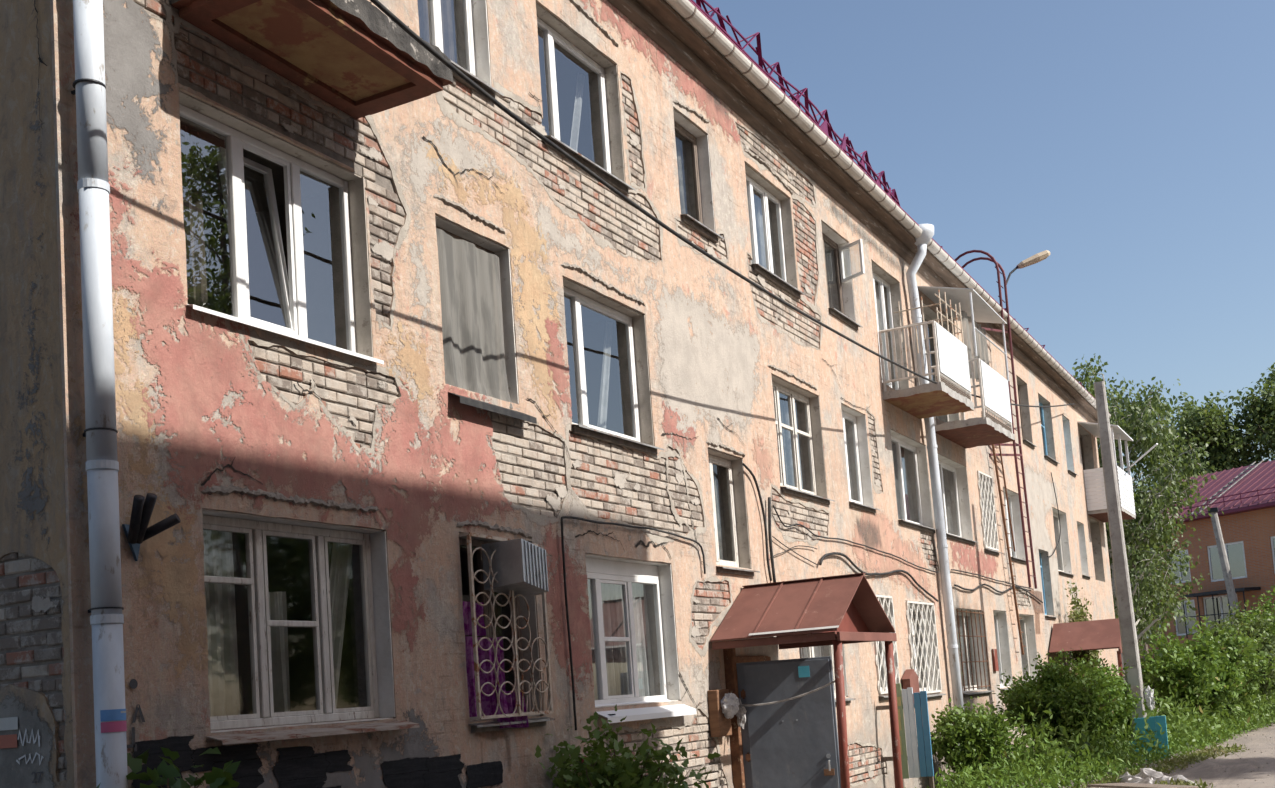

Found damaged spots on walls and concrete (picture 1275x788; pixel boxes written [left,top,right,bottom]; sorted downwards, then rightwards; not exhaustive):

flaking render [10,275,52,544]
peeling [69,409,89,548]
crack [201,458,263,486]
peeling [103,0,906,723]
flaking render [0,550,73,781]
flaking render [314,703,444,788]
flaking render [848,739,888,787]